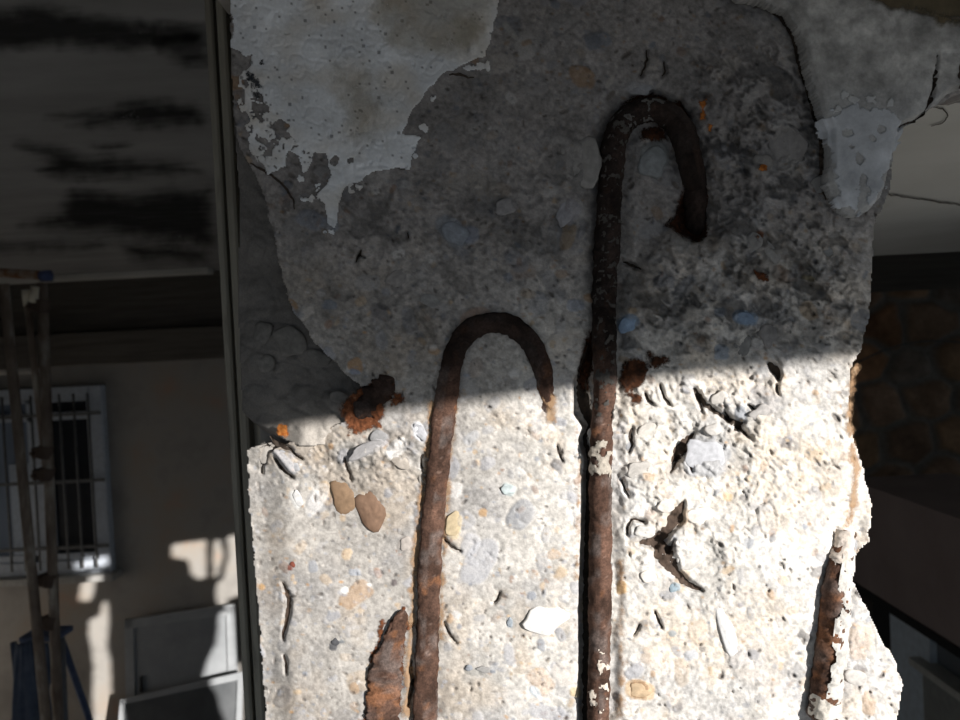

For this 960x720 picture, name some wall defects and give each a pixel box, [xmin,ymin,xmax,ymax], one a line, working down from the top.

rust [640,126,667,142]
rust [623,91,713,132]
rust [663,186,709,243]
rust [577,330,594,392]
spalling [229,0,960,720]
rust [618,350,670,405]
rust [339,383,404,436]
rust [546,395,557,423]
rust [397,401,434,716]
rust [370,619,386,664]
rust [617,644,648,716]